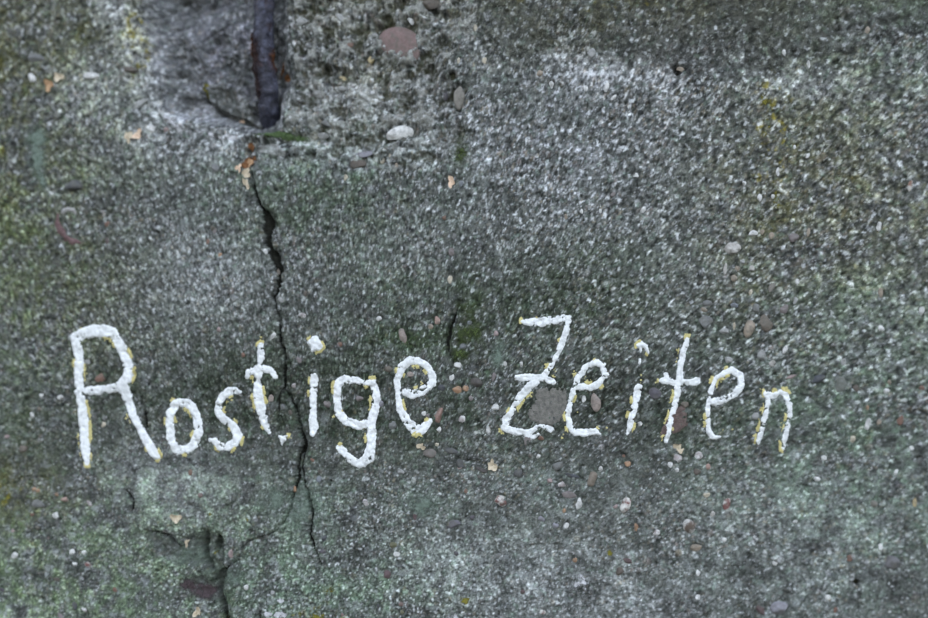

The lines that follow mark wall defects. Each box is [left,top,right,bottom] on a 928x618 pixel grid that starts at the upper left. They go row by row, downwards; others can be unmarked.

peeling [124,128,141,144]
rust [250,33,291,98]
spalling [141,0,928,181]
crack [252,174,322,564]